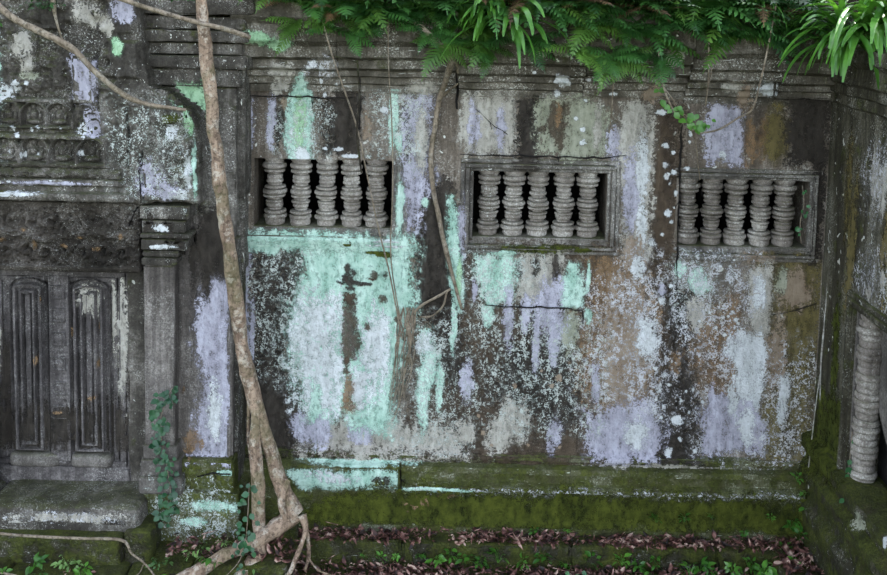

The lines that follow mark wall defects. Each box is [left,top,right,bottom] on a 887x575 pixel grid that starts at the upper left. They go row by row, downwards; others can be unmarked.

crack [485,304,584,324]
water stain [247,80,831,494]
water stain [830,125,887,396]